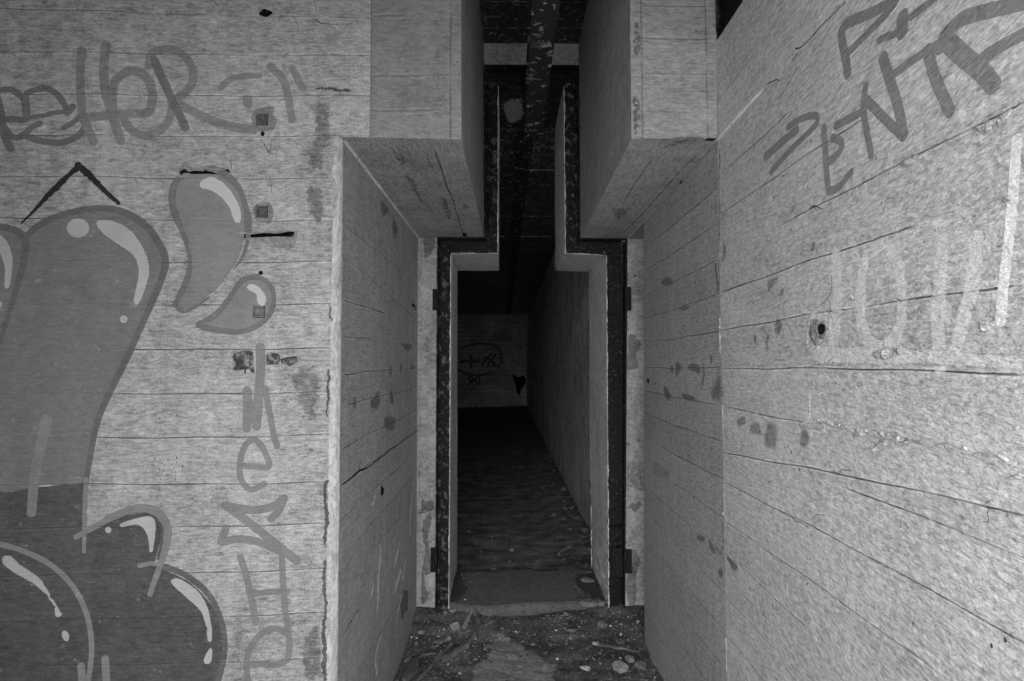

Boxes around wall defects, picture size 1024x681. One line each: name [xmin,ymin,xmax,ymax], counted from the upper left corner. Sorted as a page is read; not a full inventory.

leakage [303,86,351,224]
crack [434,150,463,232]
crack [342,431,416,485]